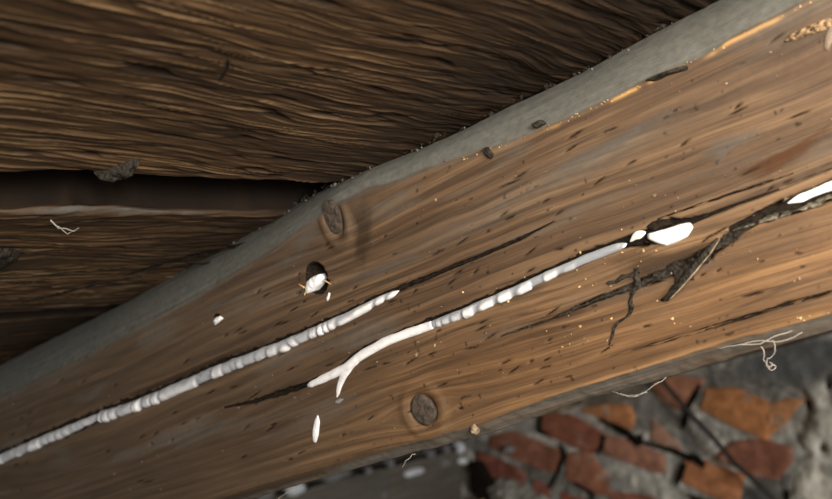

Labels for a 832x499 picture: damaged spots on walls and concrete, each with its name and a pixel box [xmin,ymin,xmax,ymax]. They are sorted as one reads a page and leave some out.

crack [224,168,832,408]